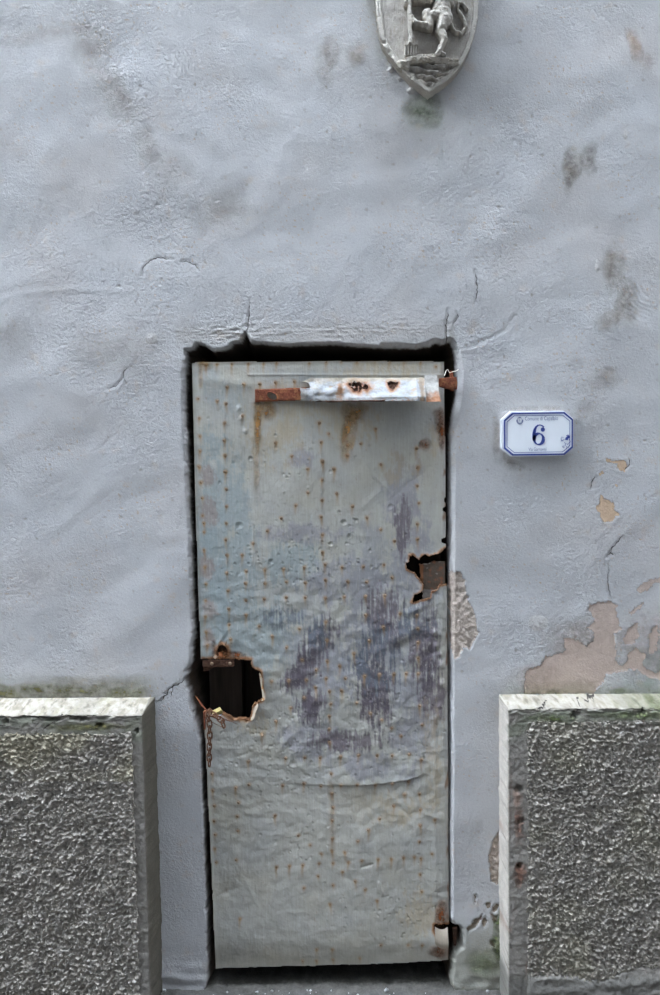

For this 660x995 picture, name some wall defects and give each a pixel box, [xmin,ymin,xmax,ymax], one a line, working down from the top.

peeling [596,495,619,522]
spalling [447,570,479,659]
peeling [524,577,660,694]